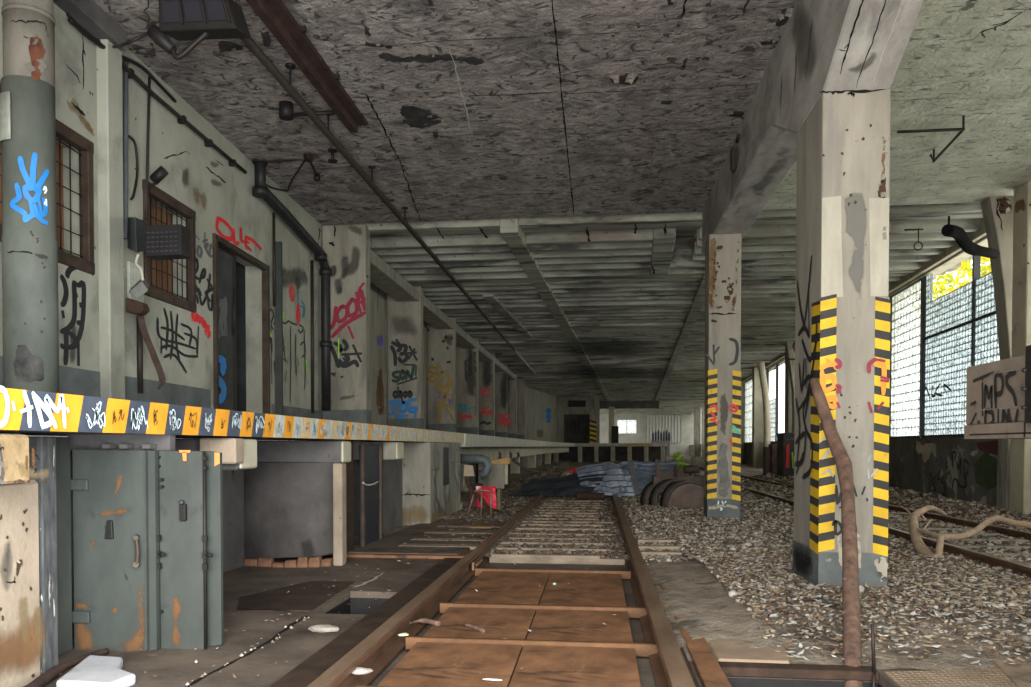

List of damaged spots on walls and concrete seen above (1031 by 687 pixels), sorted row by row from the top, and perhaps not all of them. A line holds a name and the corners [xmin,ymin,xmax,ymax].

crack [980,3,1031,38]
crack [820,0,988,117]
peeling [400,106,442,138]
crack [365,0,748,242]
rust [708,238,716,307]
peeling [13,345,44,383]
rust [126,619,144,651]
rust [173,598,181,644]